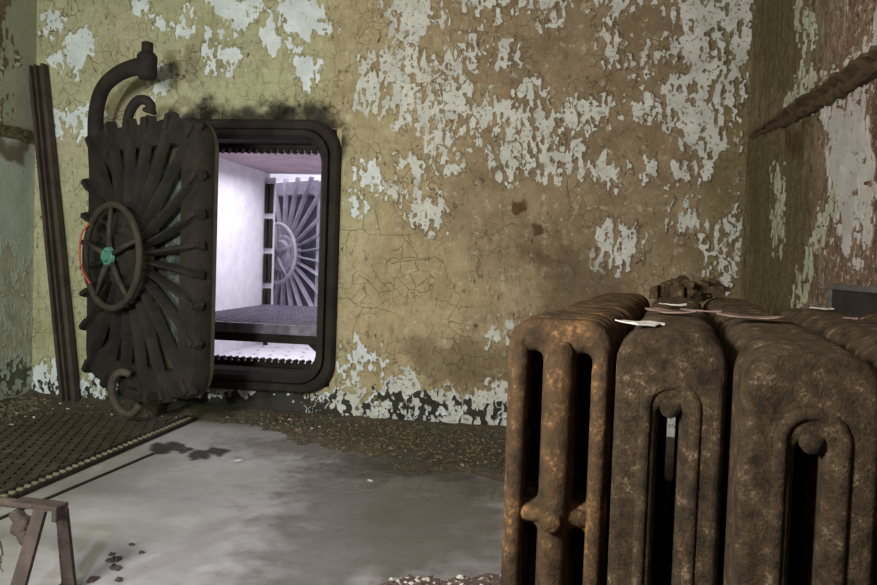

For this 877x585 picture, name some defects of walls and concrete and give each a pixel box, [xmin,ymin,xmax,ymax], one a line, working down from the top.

peeling [0,0,20,125]
peeling [38,8,100,82]
peeling [128,0,341,103]
peeling [783,0,877,108]
peeling [342,0,756,298]
peeling [769,159,787,260]
peeling [789,85,877,310]
peeling [0,239,59,397]
peeling [151,329,508,426]
peeling [481,306,531,359]
peeling [667,418,675,437]